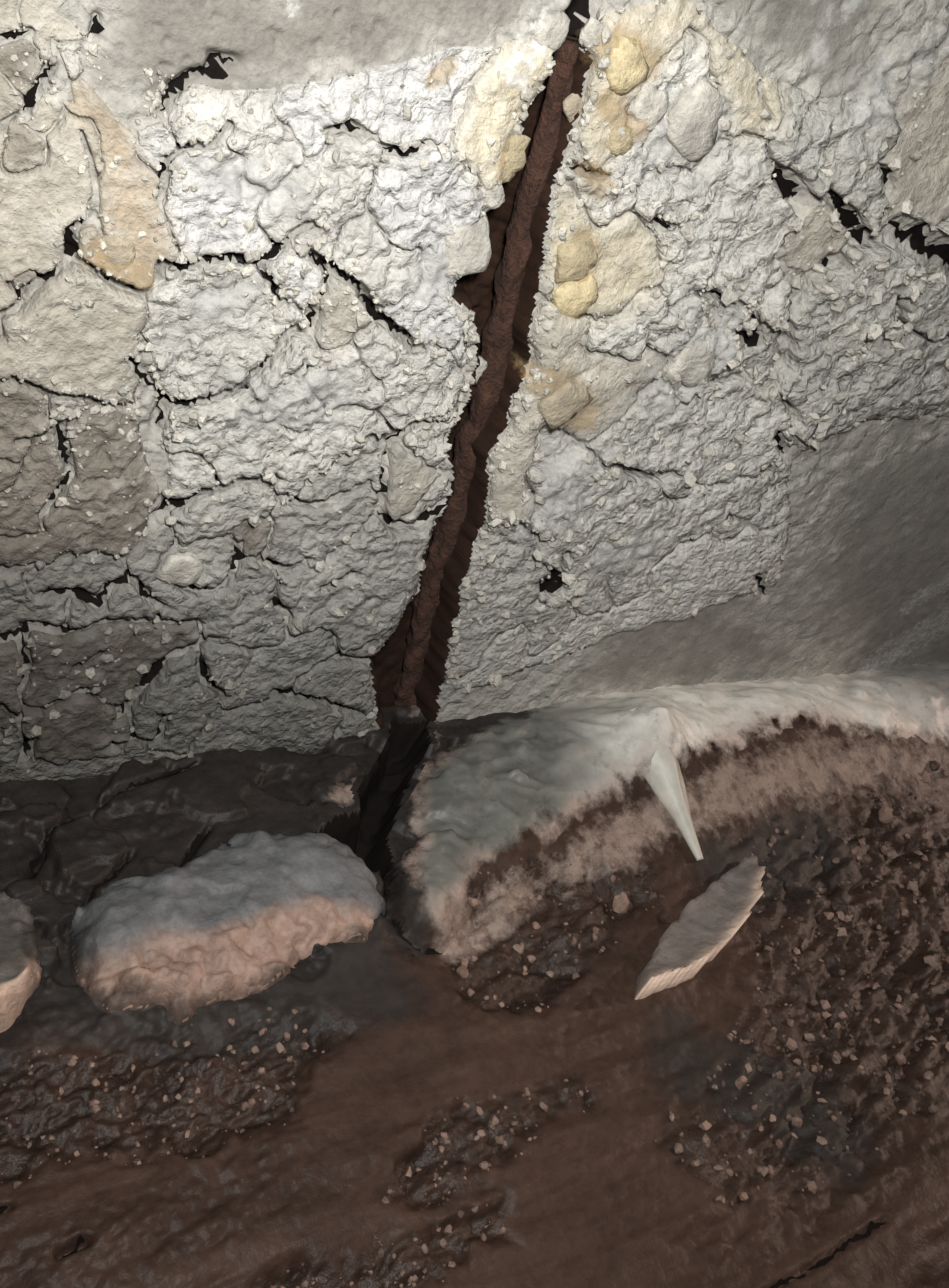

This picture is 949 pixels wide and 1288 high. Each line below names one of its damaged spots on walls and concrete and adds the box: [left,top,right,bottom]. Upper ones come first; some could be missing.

crack [160,52,233,111]
crack [10,219,148,307]
crack [172,236,412,348]
crack [771,167,949,266]
crack [128,342,278,424]
peeling [0,0,949,782]
crack [274,0,597,955]
damp [332,785,354,802]
damp [385,662,949,963]
damp [27,927,410,1061]
spalling [654,761,949,1207]
damp [651,1015,872,1181]